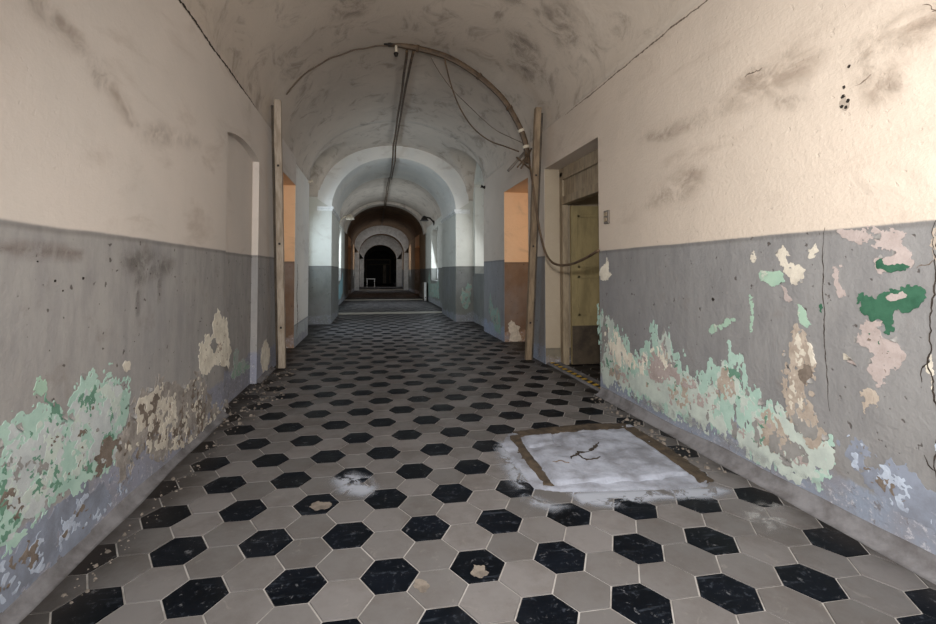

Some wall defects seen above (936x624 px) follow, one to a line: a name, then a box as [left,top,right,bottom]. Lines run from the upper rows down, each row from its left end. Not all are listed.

peeling [0,308,250,559]
peeling [597,245,836,492]
peeling [832,265,846,298]
peeling [836,225,914,274]
peeling [854,284,927,414]
crack [917,220,936,405]
crack [924,442,936,475]